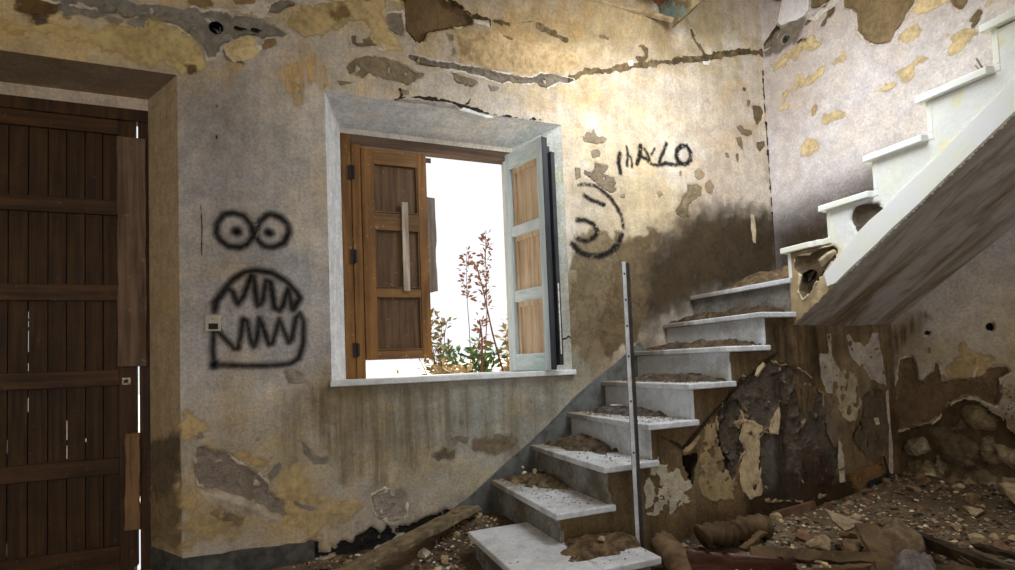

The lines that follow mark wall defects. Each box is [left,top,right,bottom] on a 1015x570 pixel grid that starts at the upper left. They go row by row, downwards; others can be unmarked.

peeling [2,0,576,95]
crack [394,88,541,120]
crack [473,13,569,43]
crack [568,29,776,266]
peeling [812,105,845,125]
flaking render [762,0,968,71]
peeling [874,56,928,92]
peeling [946,2,991,56]
damp [845,179,874,198]
damp [569,201,831,360]
flaking render [179,410,317,515]
flaking render [536,332,1015,566]